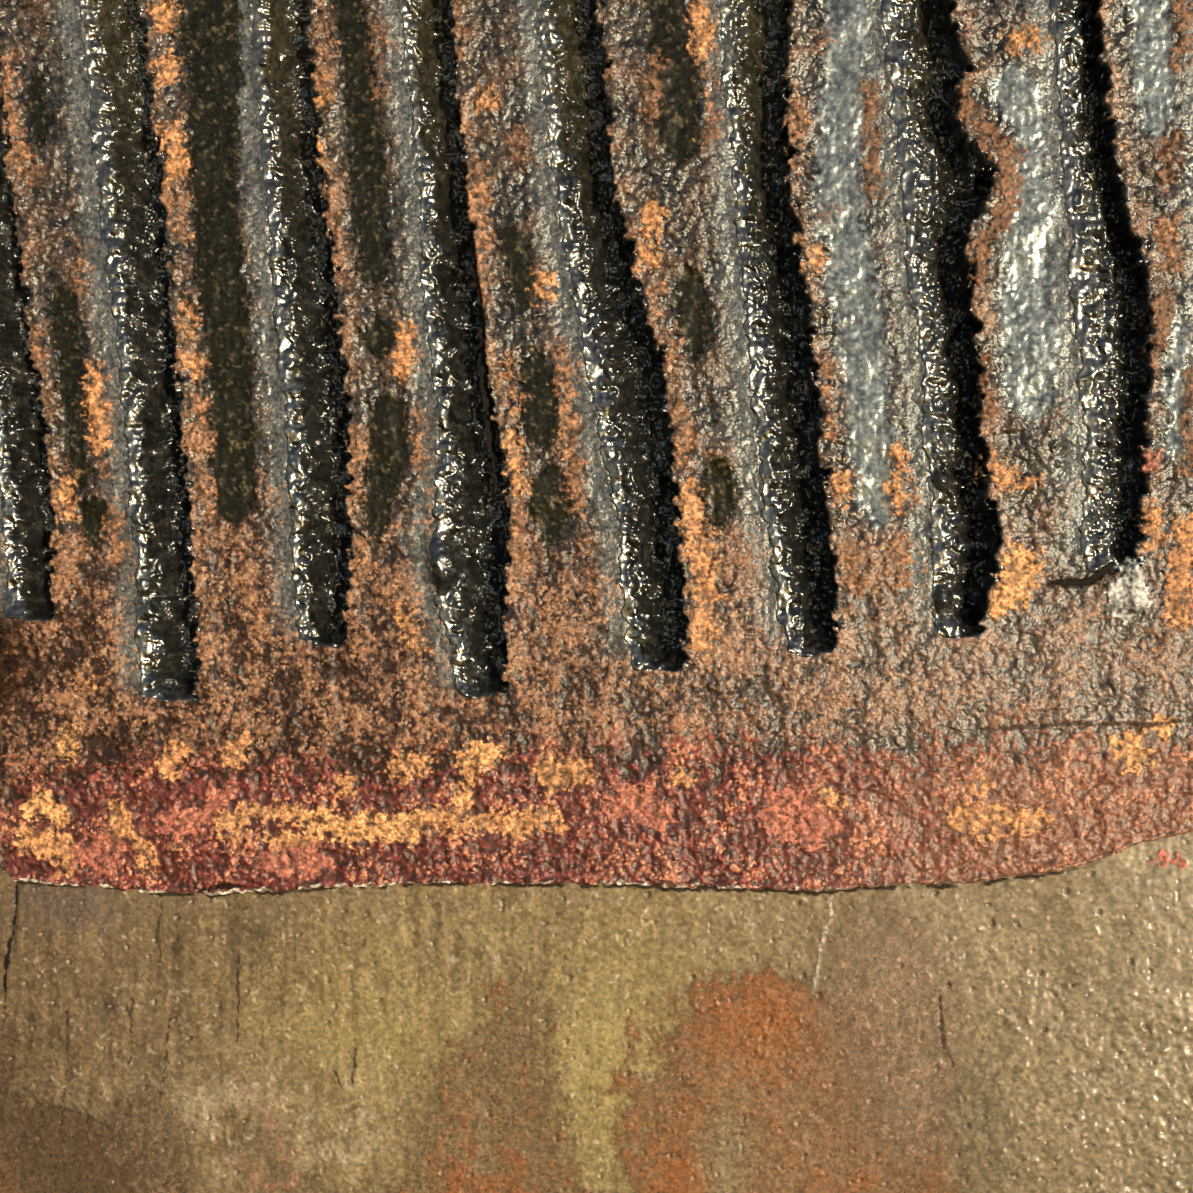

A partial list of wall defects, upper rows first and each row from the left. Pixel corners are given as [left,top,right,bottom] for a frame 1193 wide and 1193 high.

rust [153,117,196,246]
rust [80,356,116,480]
rust [668,398,767,661]
rust [988,541,1045,622]
rust [1139,497,1193,662]
peeling [0,703,1193,896]
crack [983,867,1086,886]
crack [1,875,954,1043]
crack [127,998,135,1063]
crack [159,1007,172,1099]
rust [594,900,971,1193]
crack [938,996,954,1065]